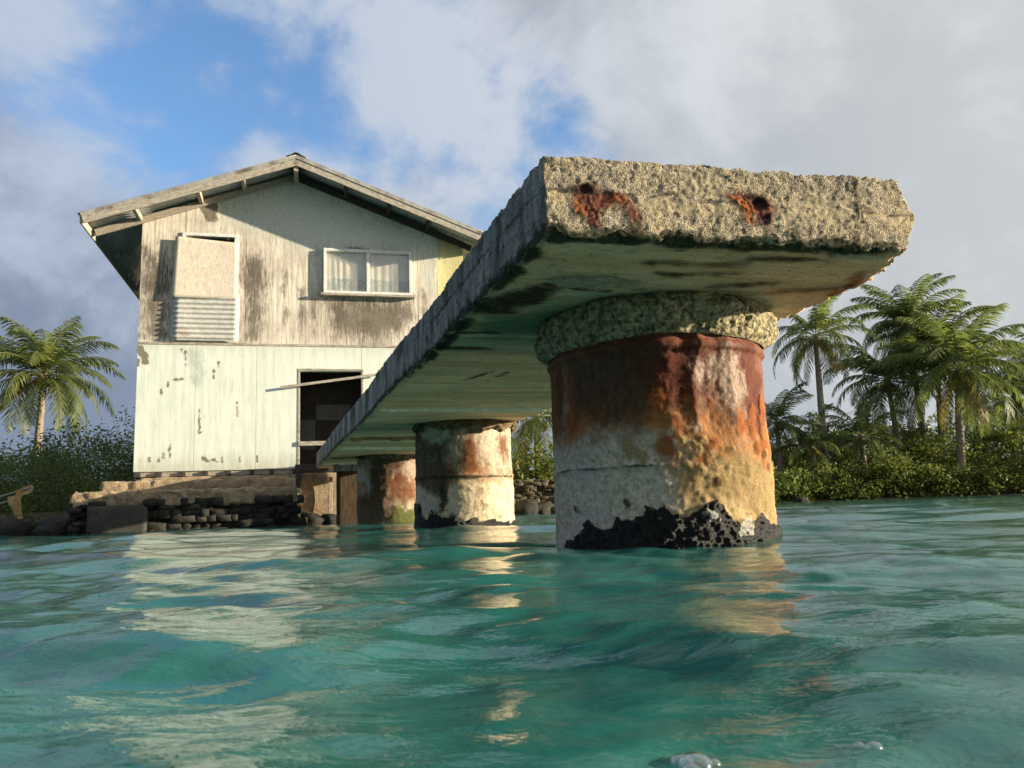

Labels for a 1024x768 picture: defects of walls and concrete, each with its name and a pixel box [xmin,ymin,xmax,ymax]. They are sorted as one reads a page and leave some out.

rust [573,184,641,231]
rust [725,191,775,226]
peeling [136,345,149,366]
damp [134,245,174,342]
damp [240,255,288,341]
damp [284,214,561,453]
rust [549,360,576,438]
rust [626,339,771,468]
rust [385,463,414,504]
rust [464,436,483,491]